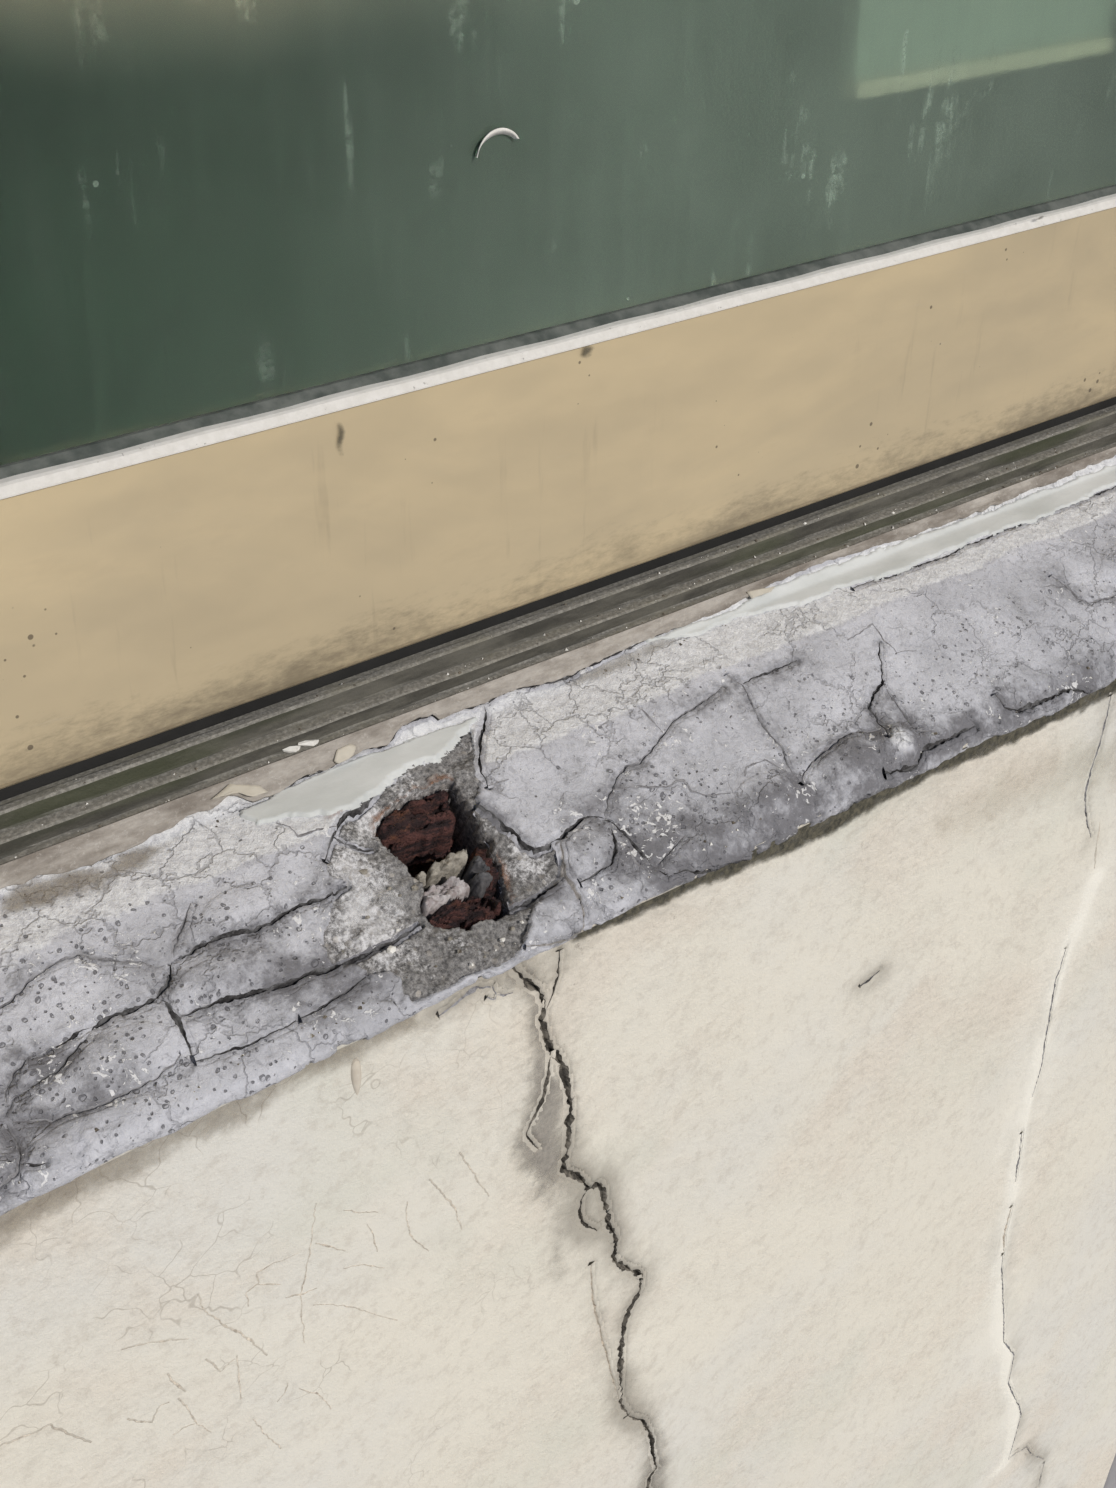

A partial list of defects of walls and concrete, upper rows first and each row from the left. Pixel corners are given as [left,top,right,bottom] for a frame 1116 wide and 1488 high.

crack [851,485,1116,591]
crack [1049,574,1116,607]
spalling [211,717,558,1001]
crack [0,623,1114,1488]